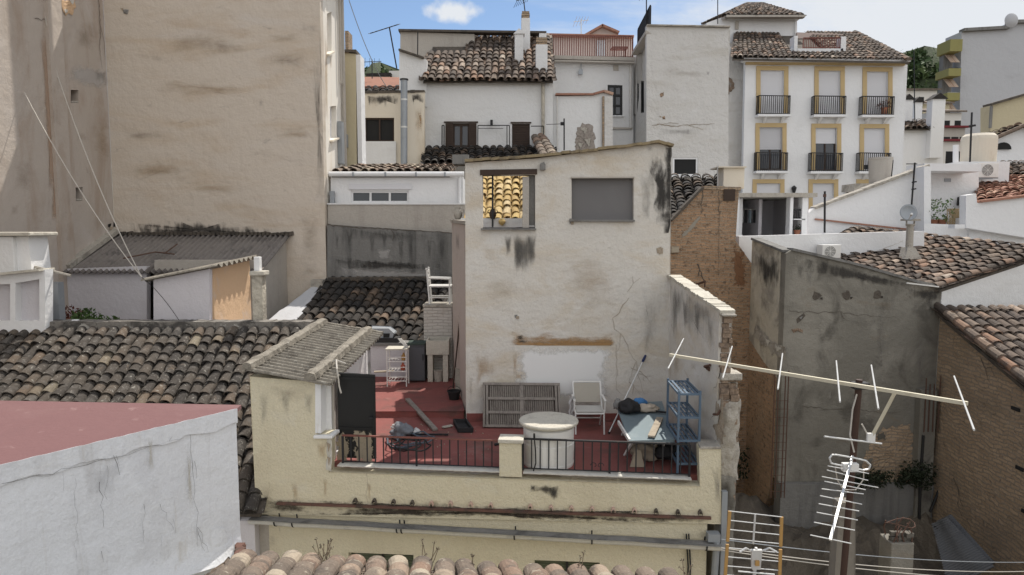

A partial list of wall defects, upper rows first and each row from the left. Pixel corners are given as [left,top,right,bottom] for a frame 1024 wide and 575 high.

damp [145,223,249,232]
damp [506,240,534,262]
damp [652,147,672,233]
damp [759,258,778,282]
crack [612,276,674,394]
spalling [713,316,740,444]
crack [2,436,208,557]